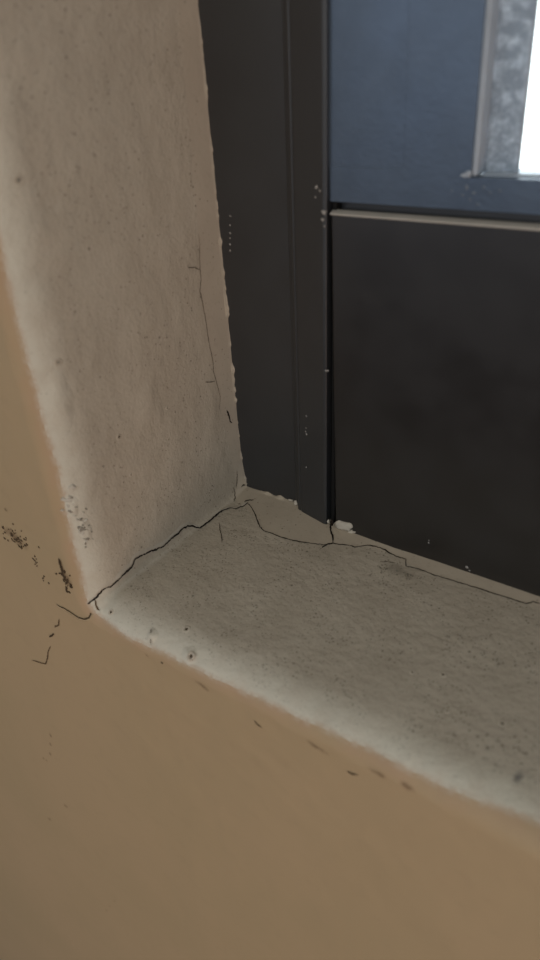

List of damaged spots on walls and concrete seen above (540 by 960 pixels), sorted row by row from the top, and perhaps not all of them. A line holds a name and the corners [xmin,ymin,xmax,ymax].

crack [189,234,232,423]
crack [32,474,540,664]